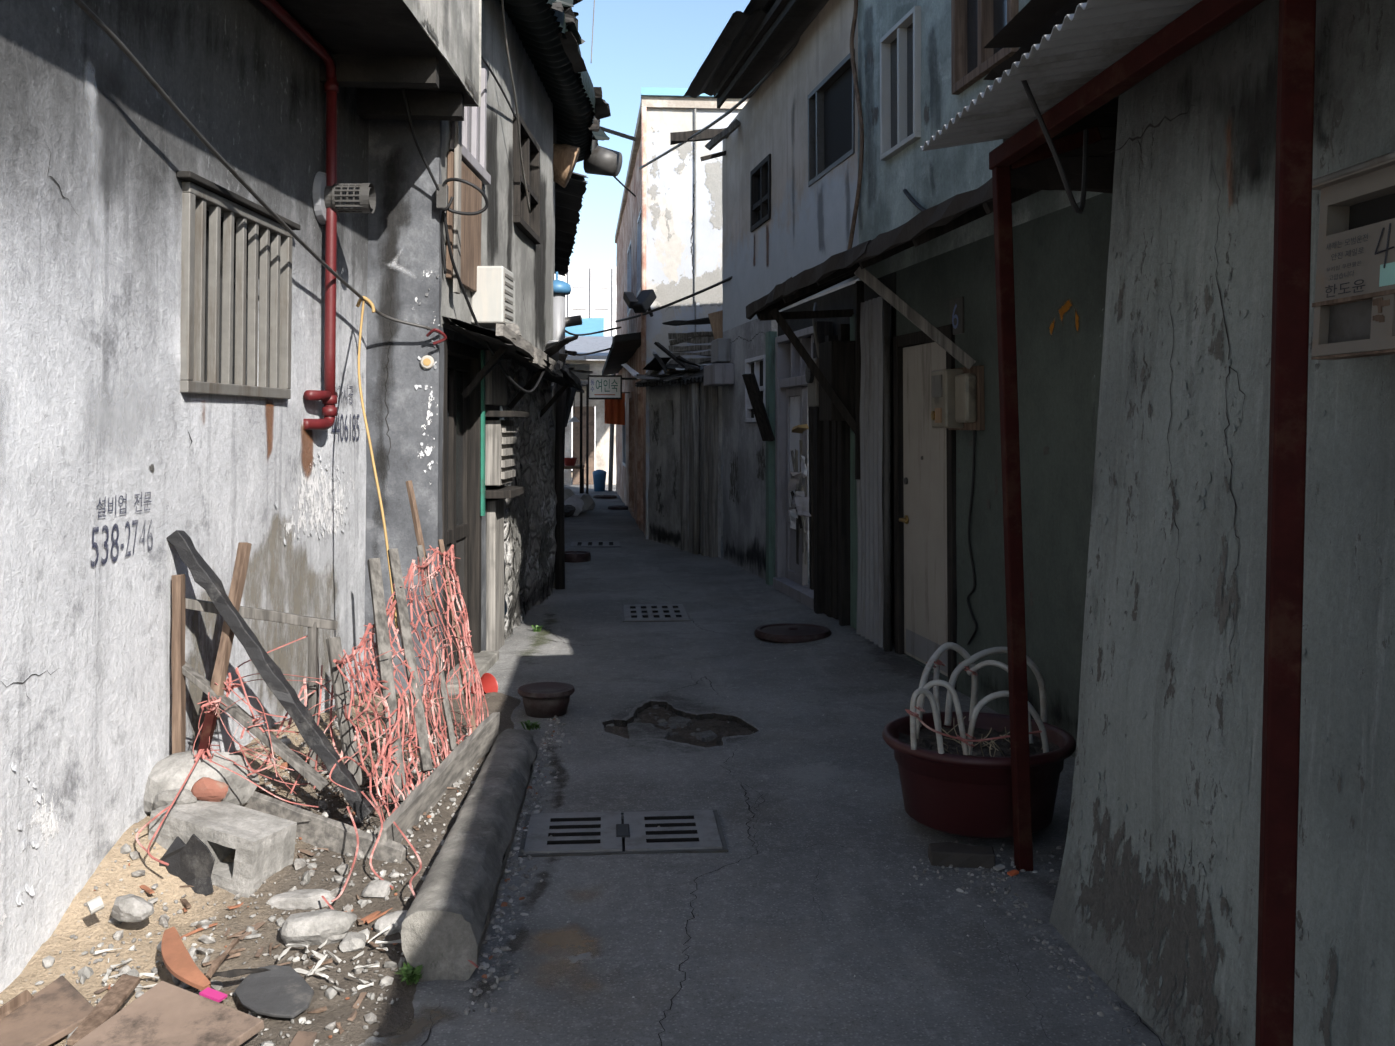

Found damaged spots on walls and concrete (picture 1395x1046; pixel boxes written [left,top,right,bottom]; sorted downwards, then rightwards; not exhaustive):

peeling [412,271,440,485]
peeling [647,127,723,244]
peeling [652,267,723,312]
peeling [1158,271,1231,373]
crack [658,749,901,1046]
peeling [1073,772,1234,1046]